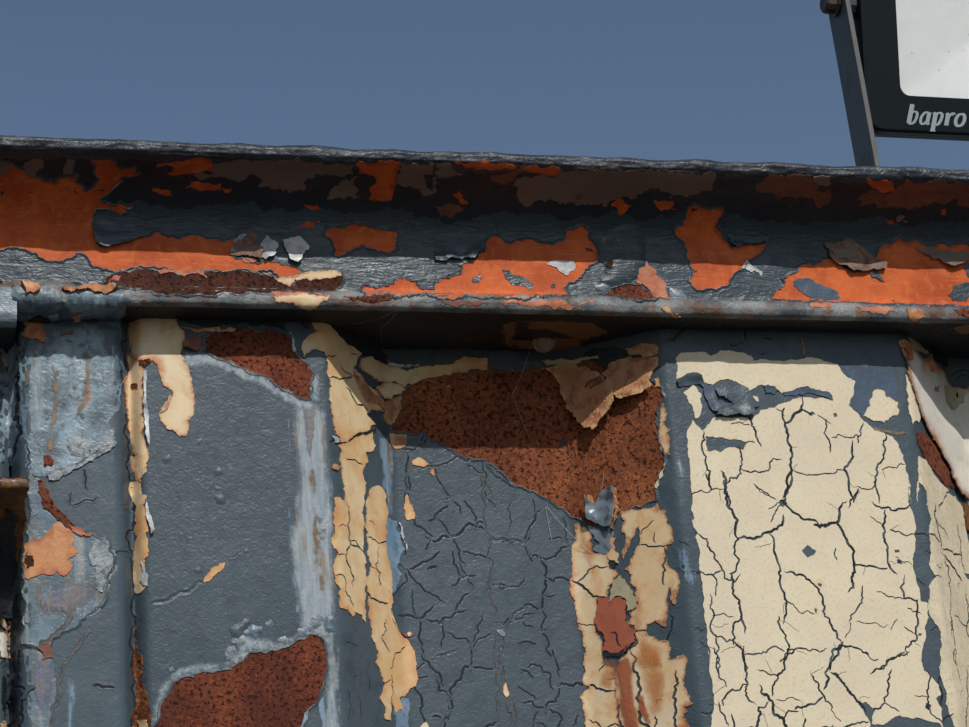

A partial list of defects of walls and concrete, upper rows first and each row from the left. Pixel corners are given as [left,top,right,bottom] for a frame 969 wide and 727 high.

peeling [0,157,400,294]
rust [101,268,393,303]
peeling [155,157,774,293]
peeling [357,224,600,310]
rust [179,325,318,408]
peeling [0,291,693,727]
crack [392,434,594,727]
rust [387,364,669,529]
crack [663,396,969,727]
peeling [676,337,969,727]
rust [131,621,331,727]
rust [604,645,661,727]